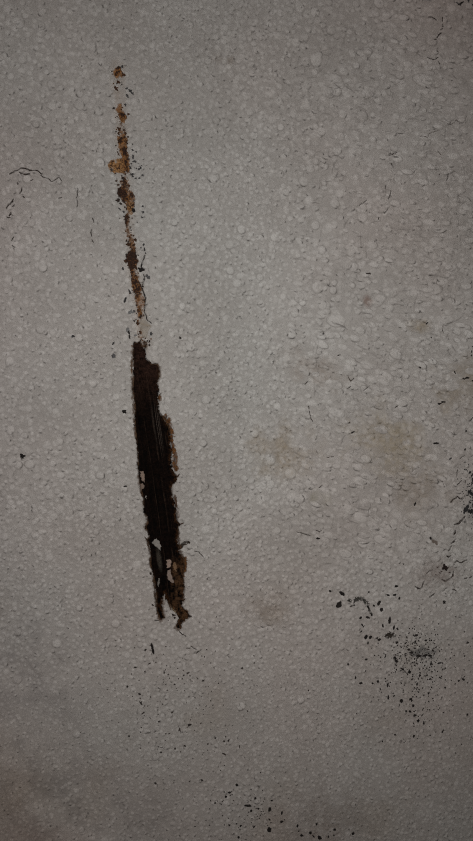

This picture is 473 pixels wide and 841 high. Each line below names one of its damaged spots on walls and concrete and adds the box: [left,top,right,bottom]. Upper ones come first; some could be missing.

corrosion [111,65,128,91]
corrosion [108,103,192,635]